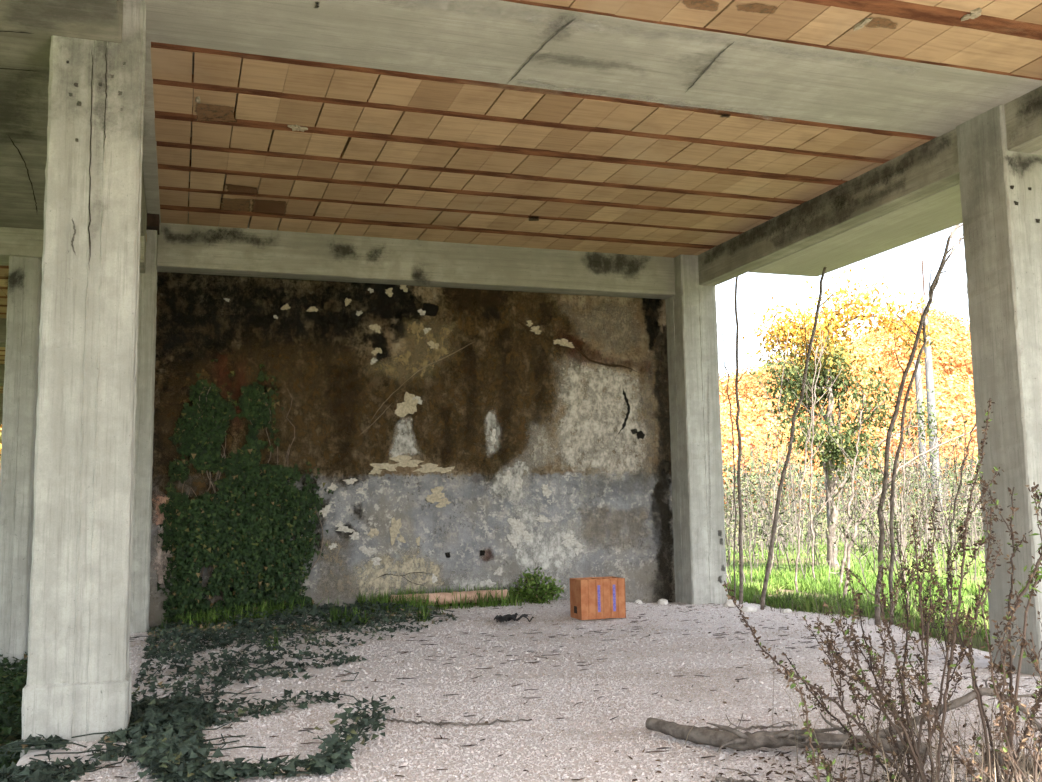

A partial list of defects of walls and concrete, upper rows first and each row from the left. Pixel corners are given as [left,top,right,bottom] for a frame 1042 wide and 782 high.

spalling [683,0,719,11]
spalling [737,4,777,14]
spalling [853,18,897,31]
crack [71,52,107,268]
damp [705,138,943,263]
damp [587,252,647,275]
damp [444,287,511,320]
damp [152,269,439,481]
crack [618,390,630,434]
damp [318,298,675,602]
flaking render [302,455,455,565]
peeling [506,514,551,548]